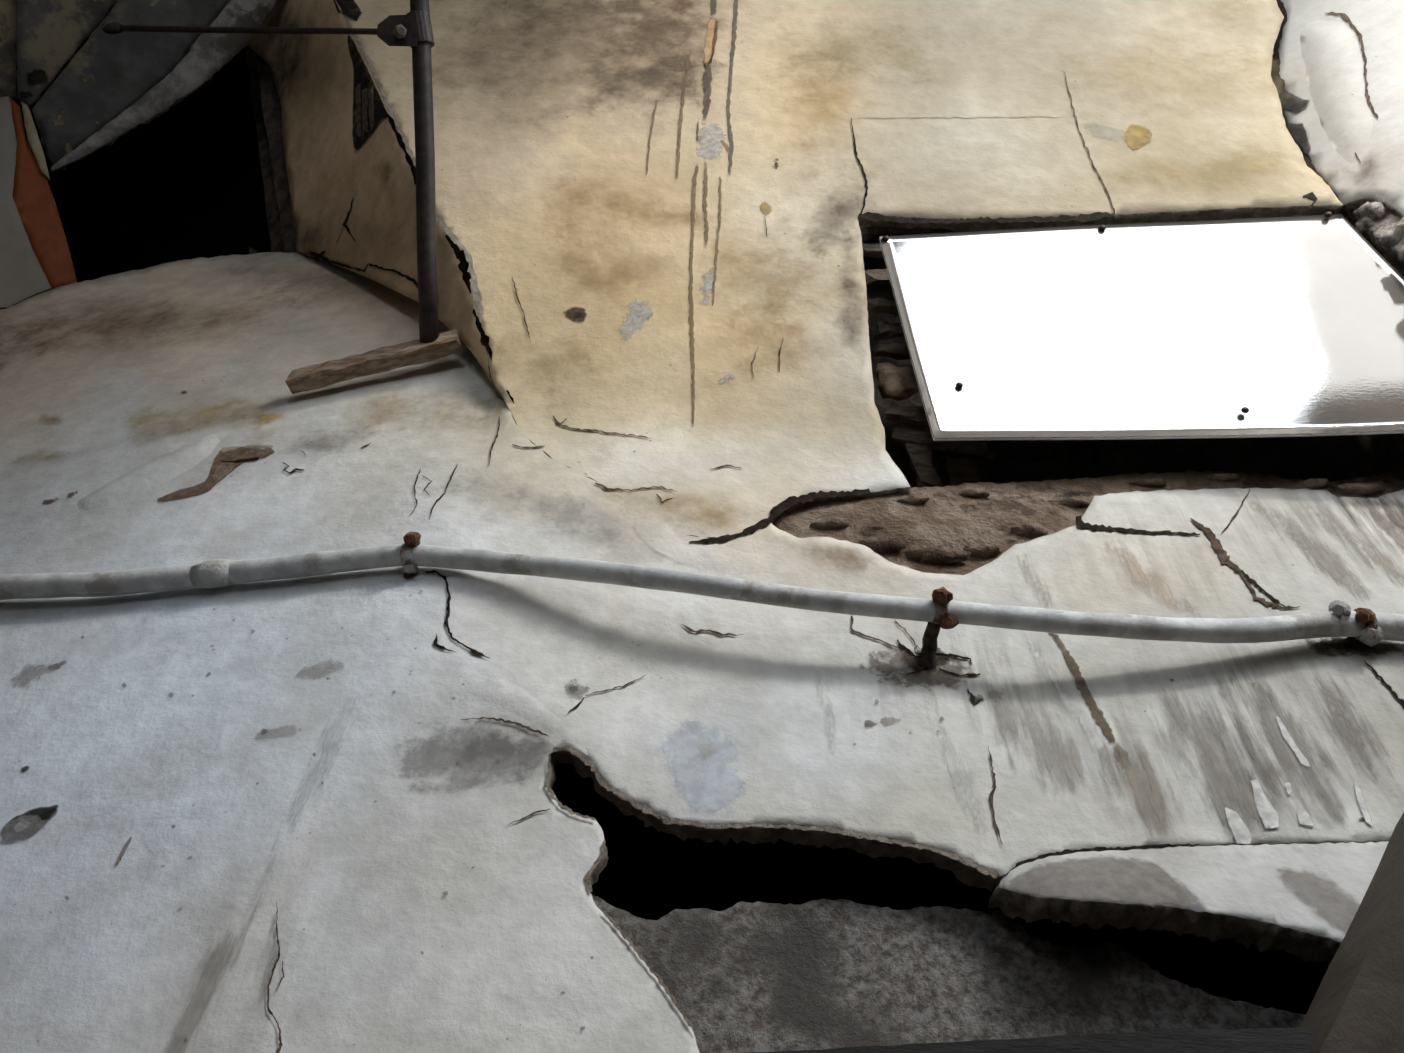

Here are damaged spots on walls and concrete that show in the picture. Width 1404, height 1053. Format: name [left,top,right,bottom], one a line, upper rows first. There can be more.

damp [607,0,738,425]
spalling [1363,201,1404,273]
flaking render [158,445,274,502]
flaking render [773,470,1404,575]
crack [1076,489,1300,609]
crack [425,570,491,659]
spalling [544,746,1328,1032]
crack [267,902,285,1053]